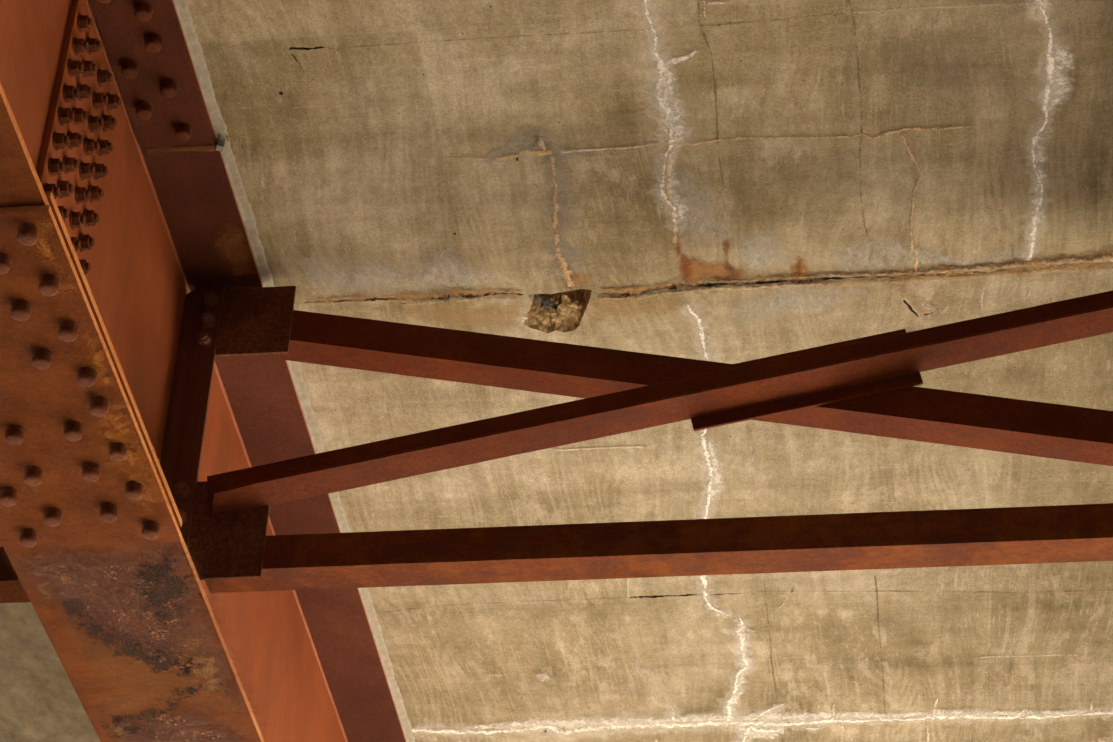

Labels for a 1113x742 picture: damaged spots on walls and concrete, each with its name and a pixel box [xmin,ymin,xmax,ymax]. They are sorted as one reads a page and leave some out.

crack [447,0,1089,361]
crack [305,292,523,303]
corrosion [309,289,521,305]
spalling [520,289,592,334]
corrosion [600,240,1113,301]
leakage [837,241,951,267]
crack [700,429,723,519]
corrosion [24,550,234,742]